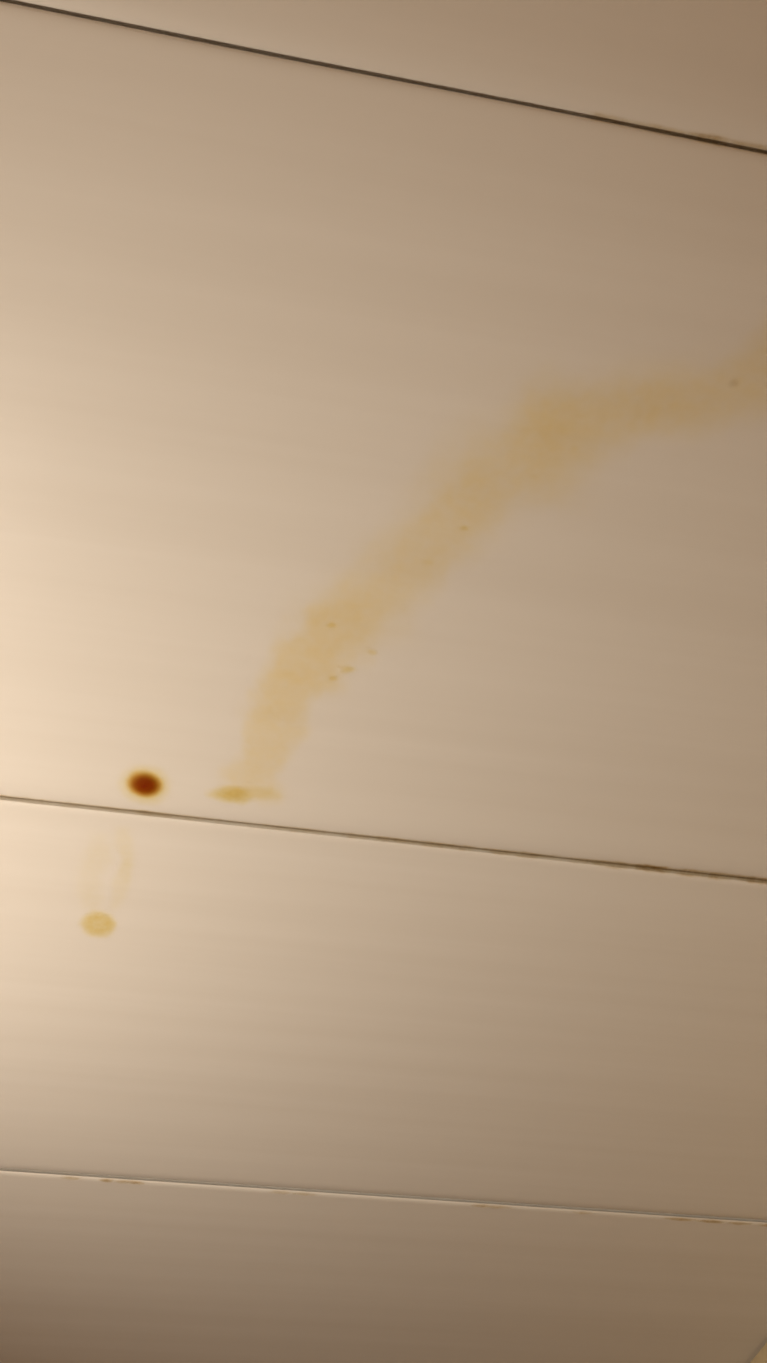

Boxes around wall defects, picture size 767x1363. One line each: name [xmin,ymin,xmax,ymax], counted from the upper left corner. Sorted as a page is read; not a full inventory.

rust [134,778,154,793]